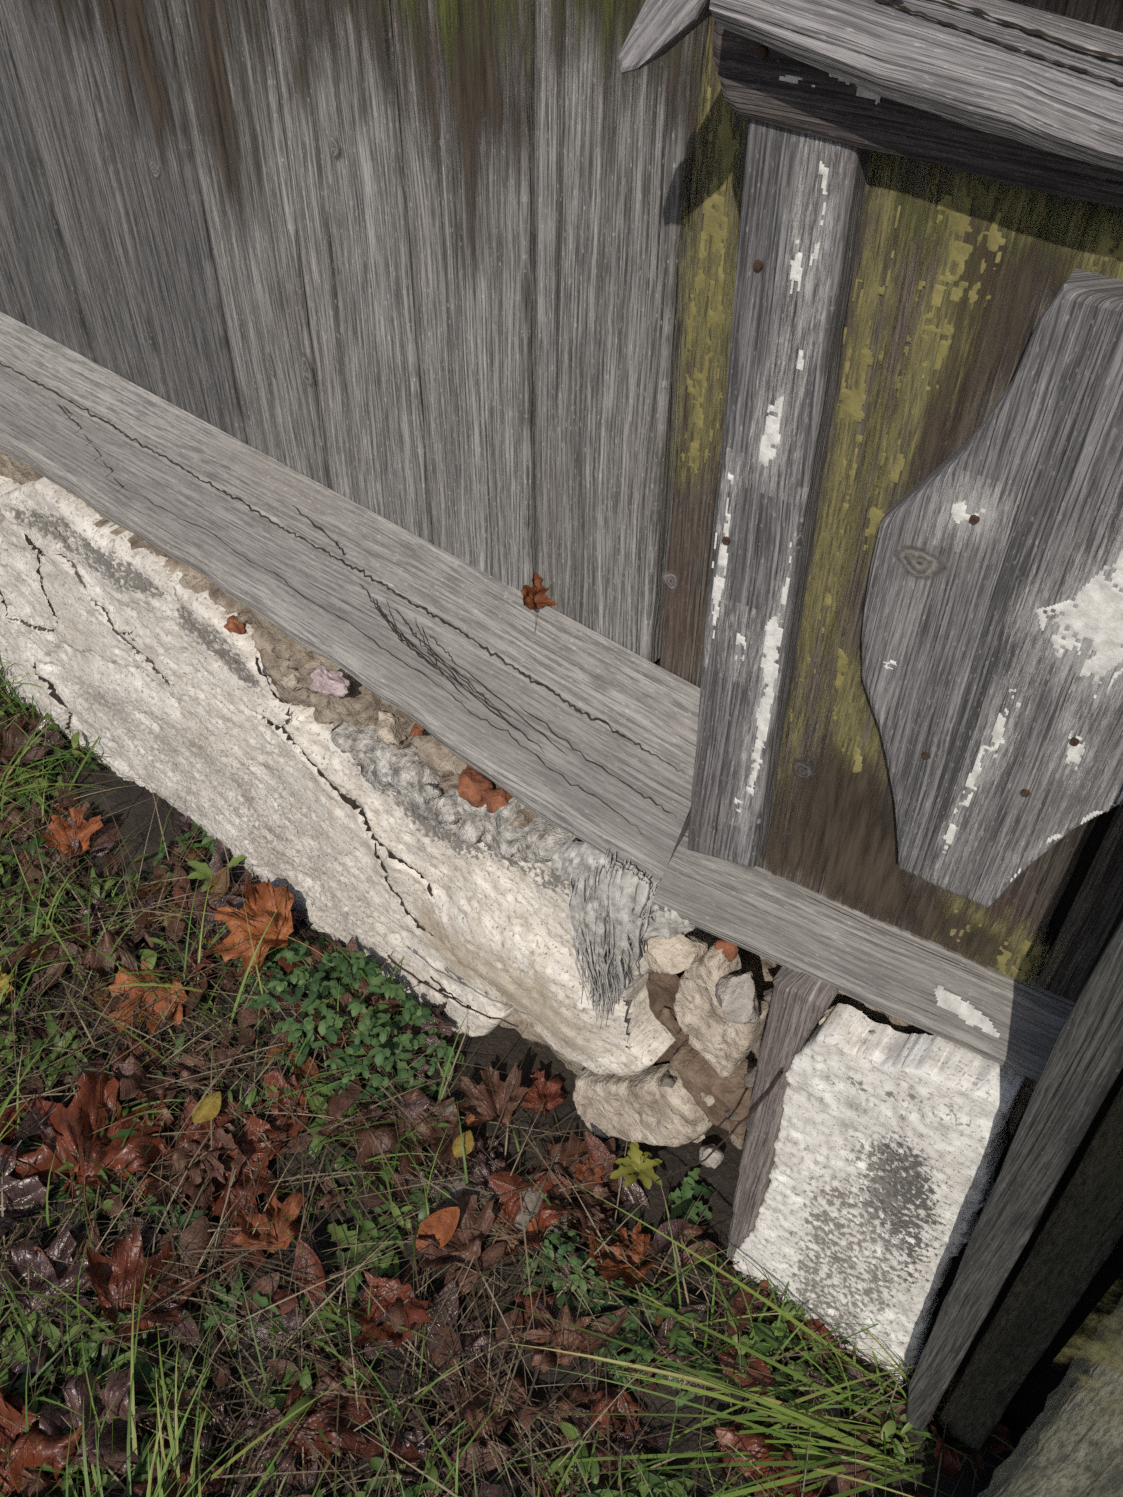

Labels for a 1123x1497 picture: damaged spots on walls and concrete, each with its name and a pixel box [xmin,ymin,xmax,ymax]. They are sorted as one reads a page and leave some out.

peeling [675,29,1047,825]
damp [909,207,1064,488]
peeling [1060,200,1123,280]
crack [0,363,684,840]
crack [255,657,435,937]
spalling [348,761,570,901]
peeling [932,529,1123,988]
peeling [934,985,1000,1038]
damp [773,1074,971,1348]